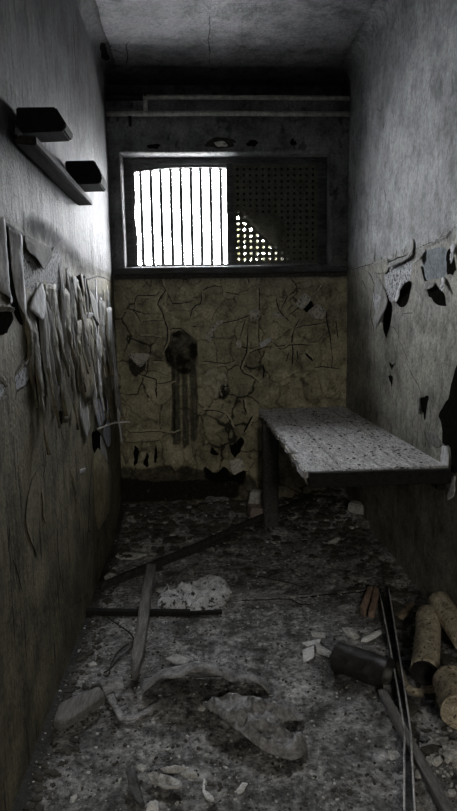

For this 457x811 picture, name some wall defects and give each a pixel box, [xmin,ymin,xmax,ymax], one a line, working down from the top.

peeling [0,217,253,485]
crack [123,278,340,398]
peeling [373,239,456,338]
leakage [171,365,230,449]
flaking render [416,395,429,420]